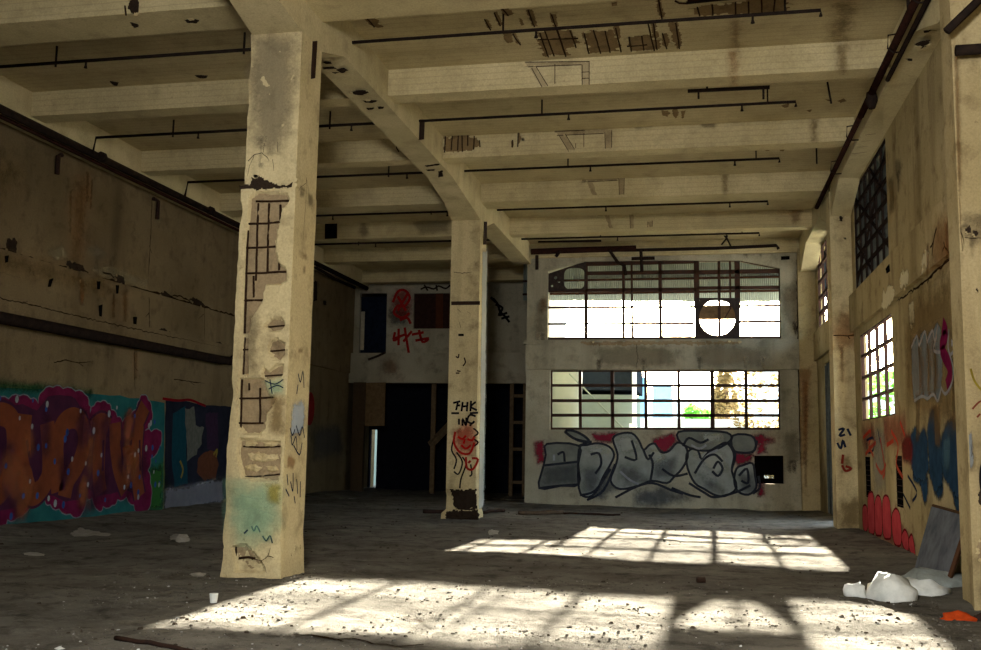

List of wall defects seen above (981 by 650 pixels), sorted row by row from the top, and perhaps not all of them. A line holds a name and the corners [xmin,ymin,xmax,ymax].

spalling [484,0,684,87]
spalling [424,135,483,178]
spalling [239,173,298,480]